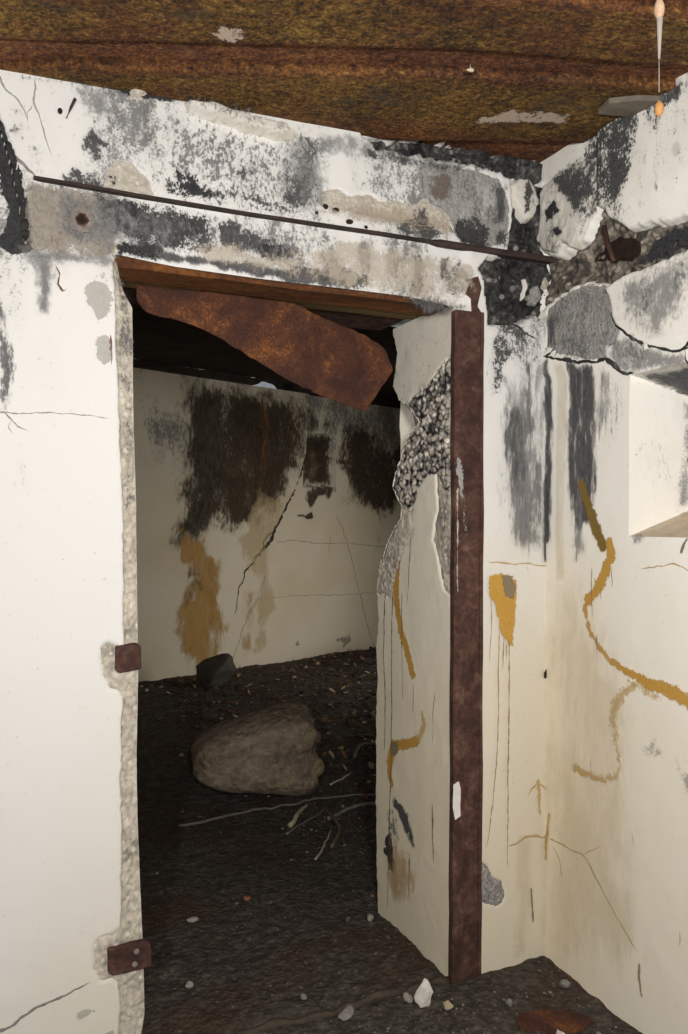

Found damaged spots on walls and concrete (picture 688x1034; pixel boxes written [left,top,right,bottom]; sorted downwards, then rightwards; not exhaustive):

water stain [0,82,509,313]
spalling [315,141,688,360]
water stain [584,82,687,224]
corrosion [136,284,393,411]
crack [495,289,688,376]
crack [0,411,104,431]
crack [233,407,386,657]
water stain [298,434,333,519]
spalling [377,358,467,598]
water stain [491,288,684,562]
crack [0,982,94,1033]